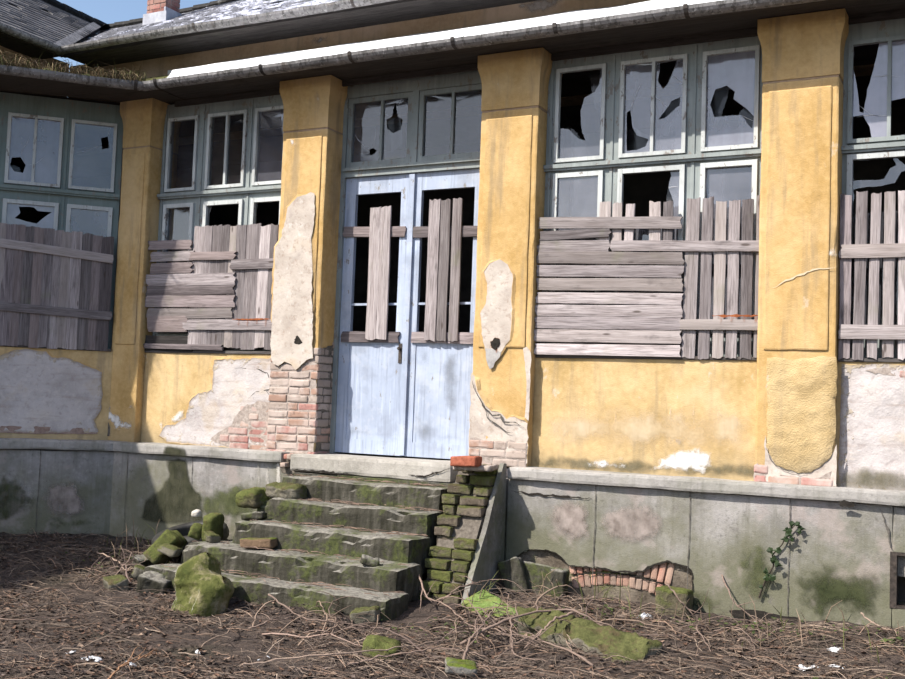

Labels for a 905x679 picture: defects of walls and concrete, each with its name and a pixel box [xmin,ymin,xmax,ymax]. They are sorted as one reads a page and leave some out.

peeling [158,192,334,474]
peeling [480,258,516,356]
crack [773,267,835,288]
peeling [0,348,130,437]
peeling [453,347,531,472]
peeling [753,364,905,491]
crack [514,491,588,499]
spalling [517,549,694,604]